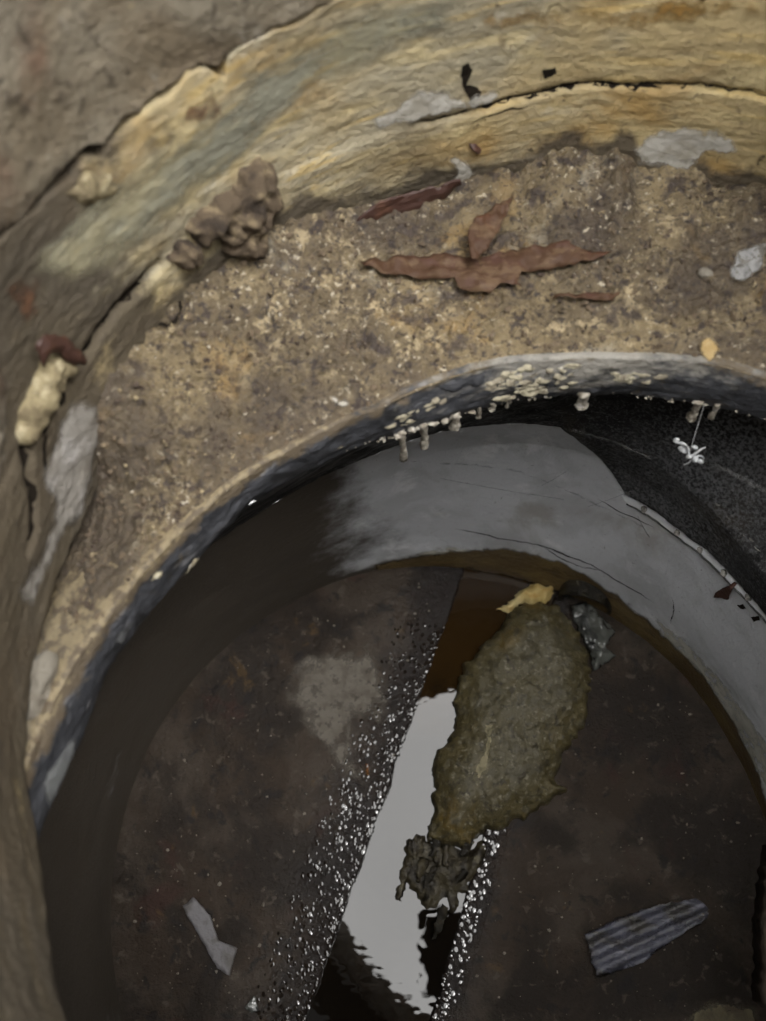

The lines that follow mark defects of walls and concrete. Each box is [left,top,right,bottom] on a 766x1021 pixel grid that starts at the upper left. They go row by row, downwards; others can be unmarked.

crack [412,80,766,124]
leakage [377,410,476,443]